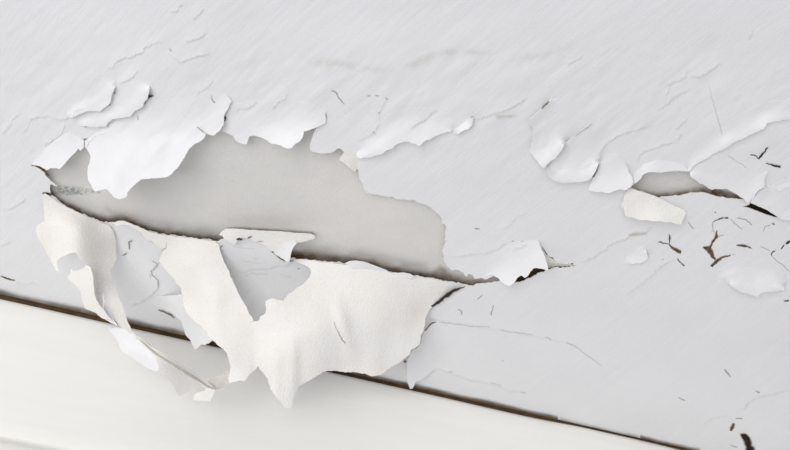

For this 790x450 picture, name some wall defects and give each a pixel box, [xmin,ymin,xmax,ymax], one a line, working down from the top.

peeling [529,98,790,224]
peeling [32,76,574,409]
crack [658,235,685,266]
crack [703,212,774,267]